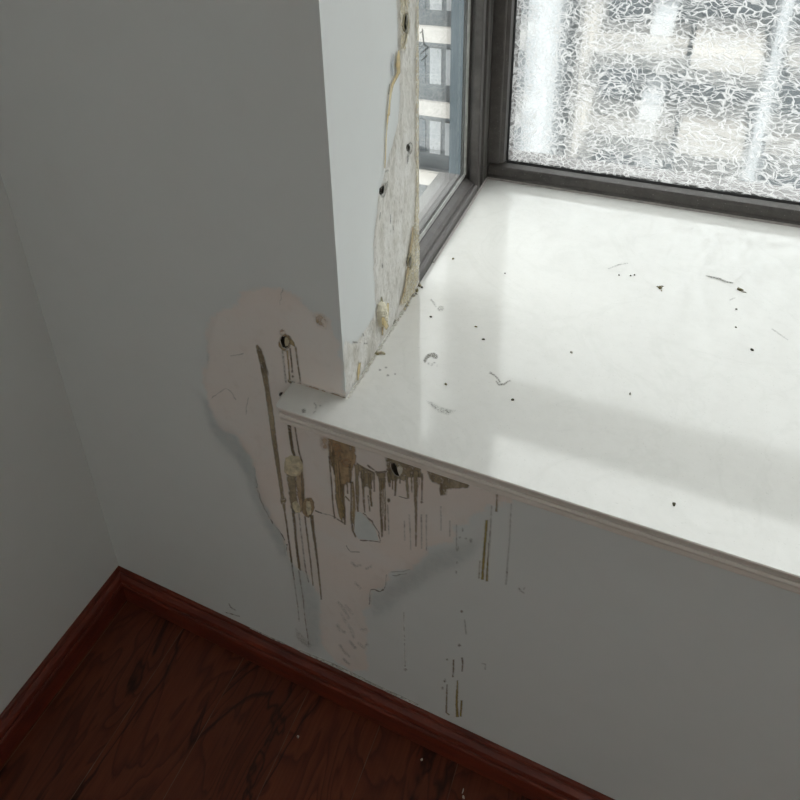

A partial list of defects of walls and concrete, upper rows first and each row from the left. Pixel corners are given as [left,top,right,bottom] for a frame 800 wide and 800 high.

peeling [201,0,514,673]
water stain [328,438,389,537]
water stain [428,471,469,495]